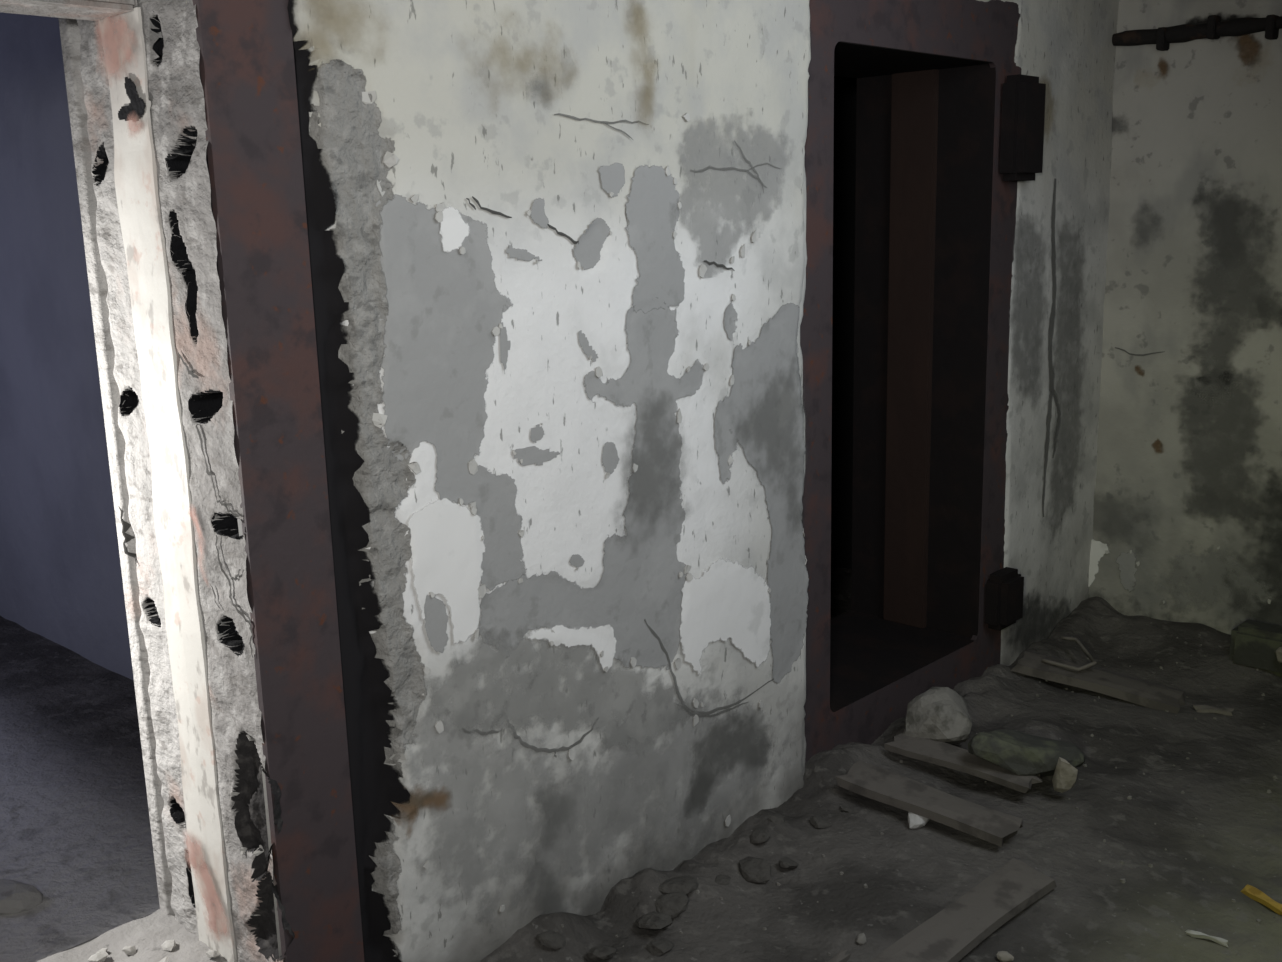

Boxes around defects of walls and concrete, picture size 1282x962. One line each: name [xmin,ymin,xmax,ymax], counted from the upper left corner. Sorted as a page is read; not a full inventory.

crack [554,113,649,140]
spalling [169,209,199,344]
spalling [119,386,139,416]
spalling [188,389,223,424]
peeling [309,59,809,778]
damp [1014,222,1081,516]
damp [1182,191,1282,626]
crack [196,420,253,657]
crack [644,619,774,717]
crack [462,713,599,757]
rust [390,790,450,834]
rust [186,835,227,934]